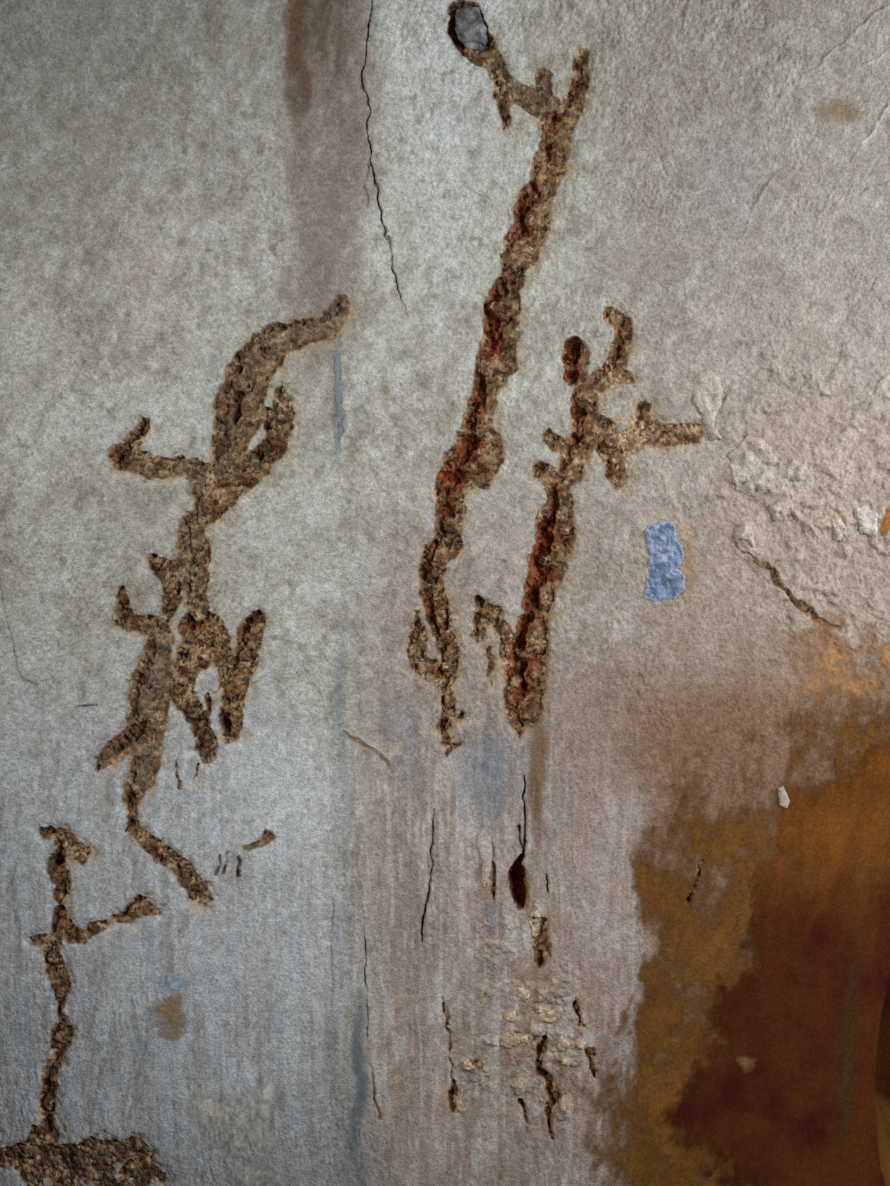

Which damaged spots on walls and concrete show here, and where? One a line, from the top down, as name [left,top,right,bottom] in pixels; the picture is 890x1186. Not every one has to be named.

crack [357,0,410,323]
spalling [172,758,185,794]
spalling [478,829,552,913]
damp [586,694,890,1186]
spalling [570,997,589,1031]
hole [445,1078,460,1117]
hole [516,1033,564,1143]
spalling [581,1045,600,1081]